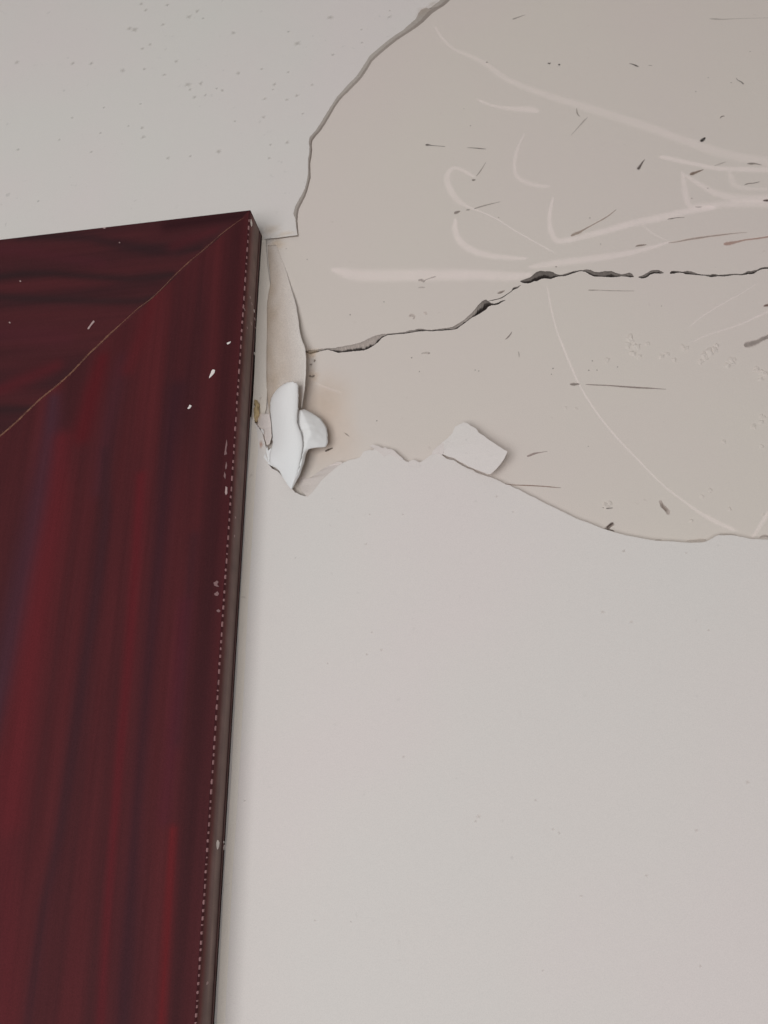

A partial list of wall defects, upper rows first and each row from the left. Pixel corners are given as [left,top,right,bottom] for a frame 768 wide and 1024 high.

peeling [256,0,768,543]
crack [306,267,768,354]